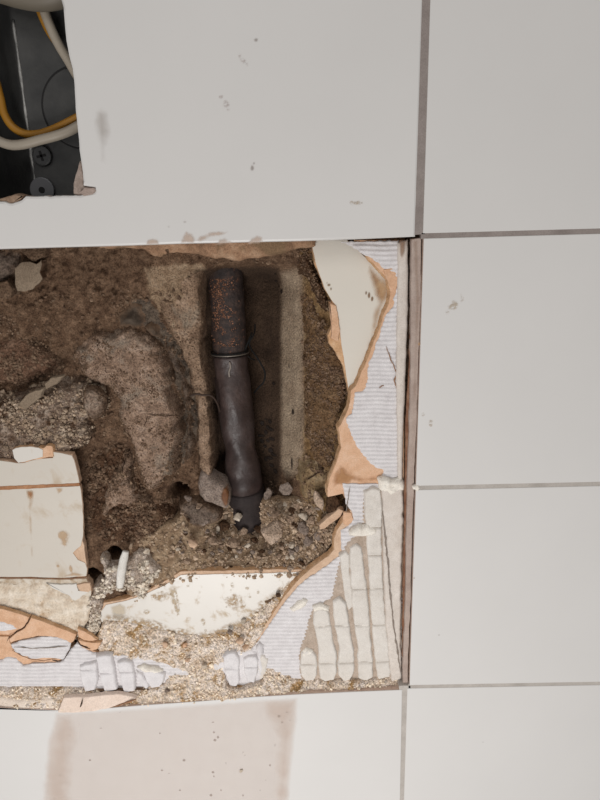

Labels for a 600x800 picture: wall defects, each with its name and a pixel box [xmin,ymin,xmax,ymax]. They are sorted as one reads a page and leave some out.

spalling [0,248,51,299]
corrosion [209,279,239,347]
spalling [286,248,348,508]
spalling [0,271,232,635]
peeling [318,506,353,529]